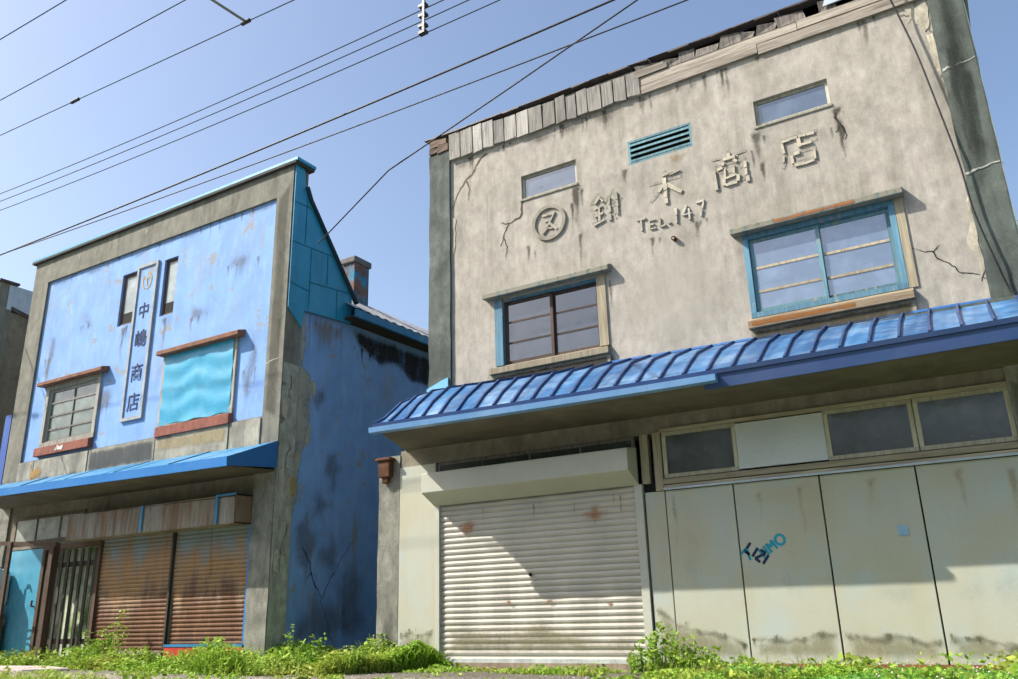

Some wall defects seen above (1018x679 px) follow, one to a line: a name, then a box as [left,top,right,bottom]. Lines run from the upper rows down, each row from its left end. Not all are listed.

crack [452,153,486,211]
crack [500,201,524,258]
crack [912,245,985,278]
peeling [278,315,316,511]
crack [279,526,355,645]